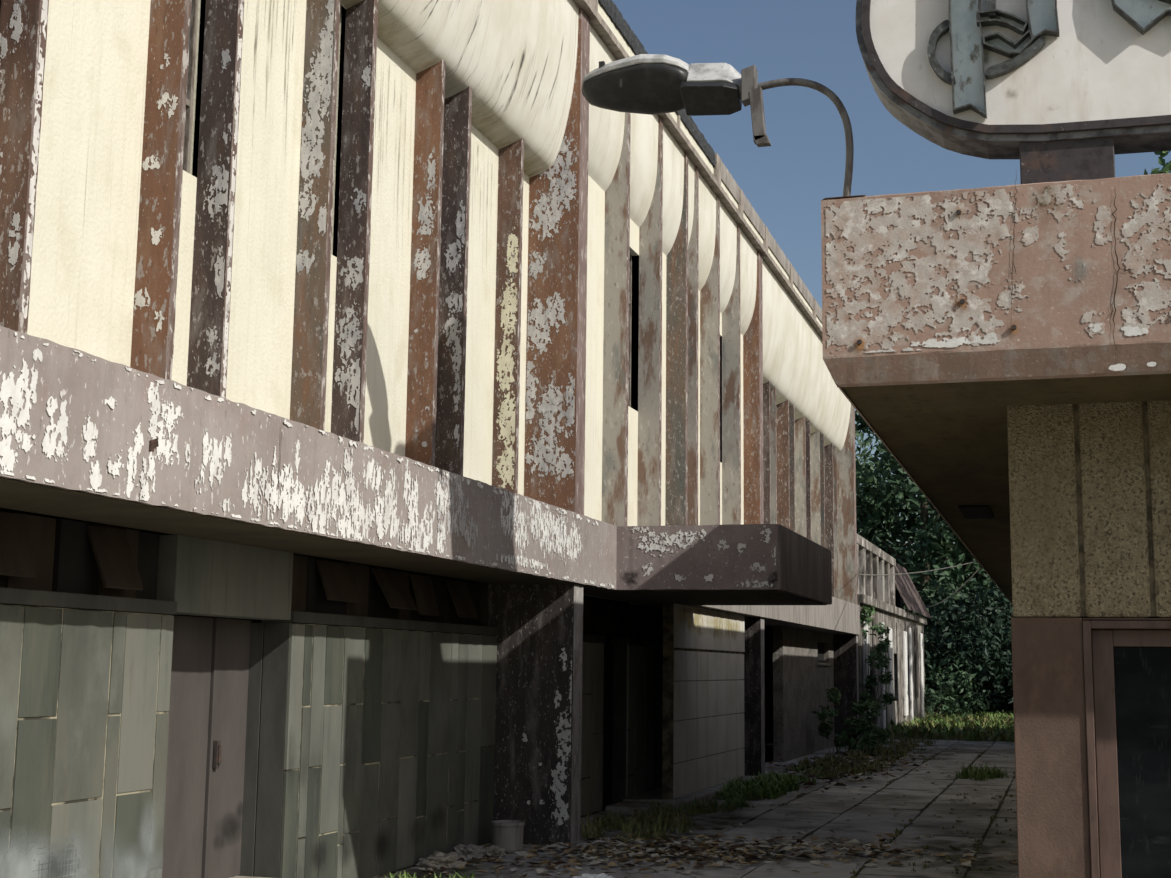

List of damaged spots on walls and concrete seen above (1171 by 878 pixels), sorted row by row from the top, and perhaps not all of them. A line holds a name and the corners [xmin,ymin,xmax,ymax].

peeling [0,0,48,339]
peeling [83,0,614,588]
peeling [825,179,1171,353]
crack [1108,193,1133,360]
peeling [0,343,69,484]
peeling [631,527,746,577]
peeling [736,525,776,588]
peeling [527,648,572,826]